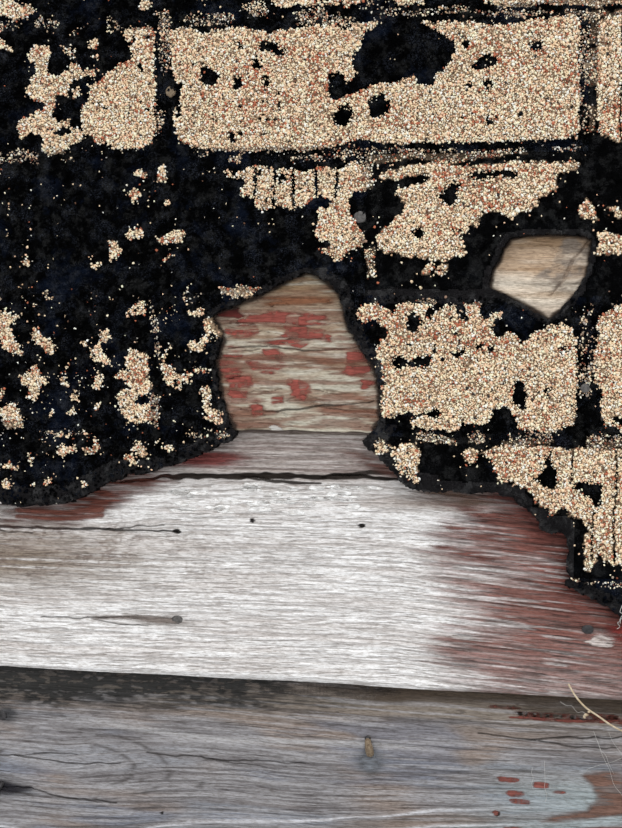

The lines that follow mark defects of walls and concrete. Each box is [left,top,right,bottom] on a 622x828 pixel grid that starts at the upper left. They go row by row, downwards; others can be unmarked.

peeling [0,0,622,505]
crack [151,470,398,484]
peeling [169,483,383,515]
spalling [572,480,603,511]
peeling [578,578,622,611]
peeling [585,636,614,647]